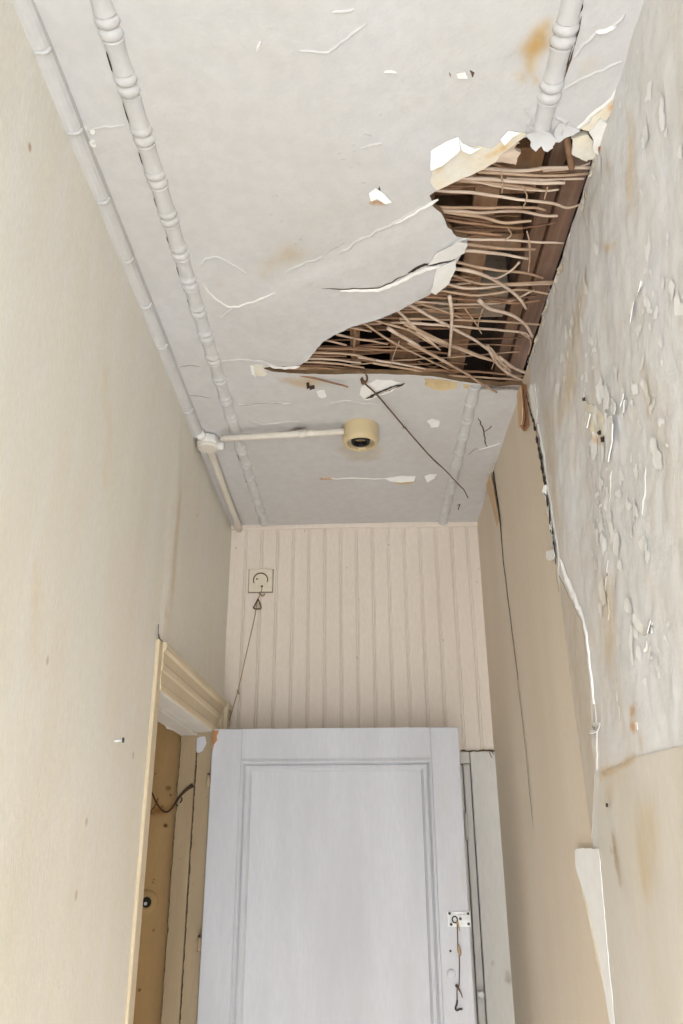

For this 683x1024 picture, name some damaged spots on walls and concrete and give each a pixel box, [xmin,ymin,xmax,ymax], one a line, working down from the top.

peeling [430,73,682,226]
peeling [369,187,392,204]
crack [322,238,467,295]
flaking render [360,380,405,400]
flaking render [424,378,469,391]
peeling [325,474,437,484]
peeling [527,234,683,686]
crack [468,417,533,822]
flaking render [559,576,595,838]